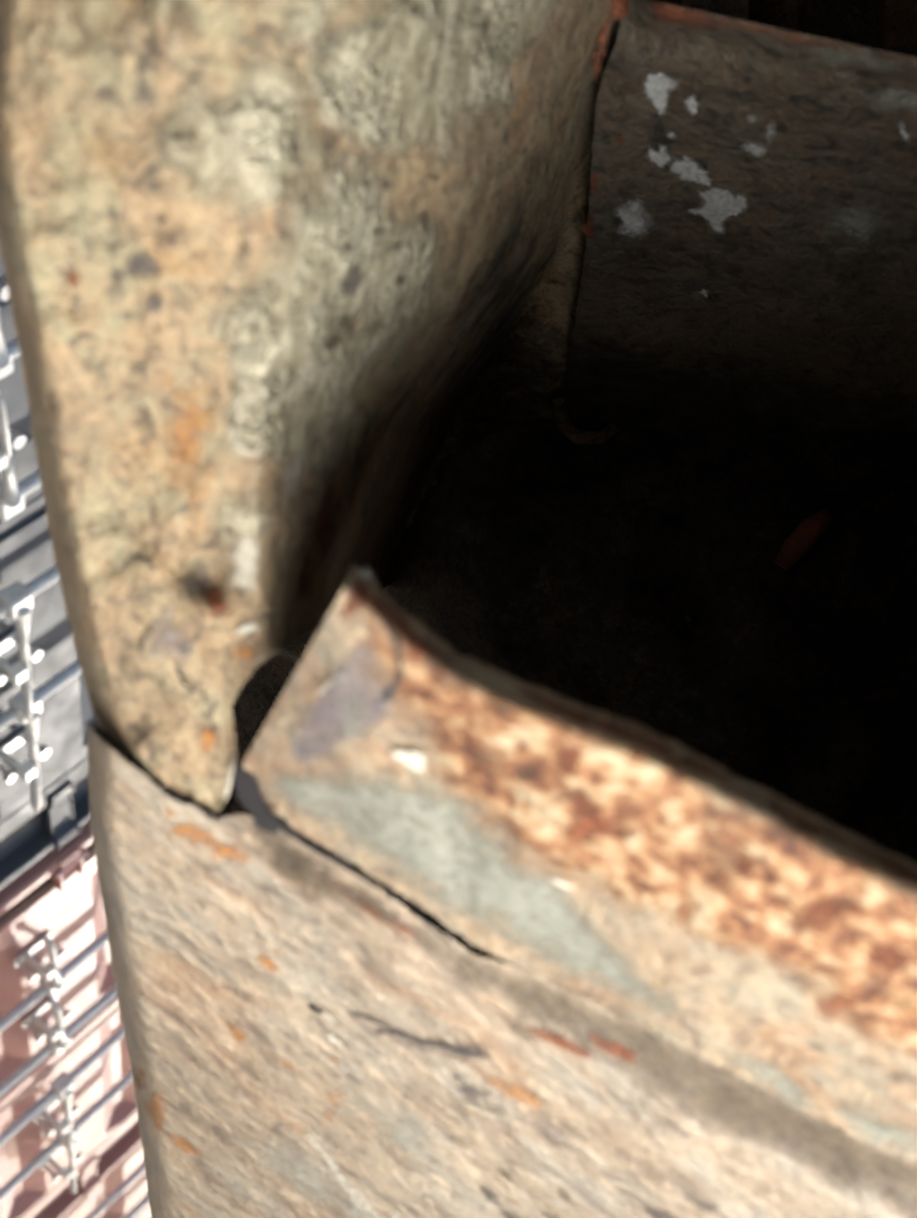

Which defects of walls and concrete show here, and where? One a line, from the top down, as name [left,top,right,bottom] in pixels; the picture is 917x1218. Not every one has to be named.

crack [86,719,476,969]
corrosion [345,579,917,1055]
corrosion [530,1029,634,1062]